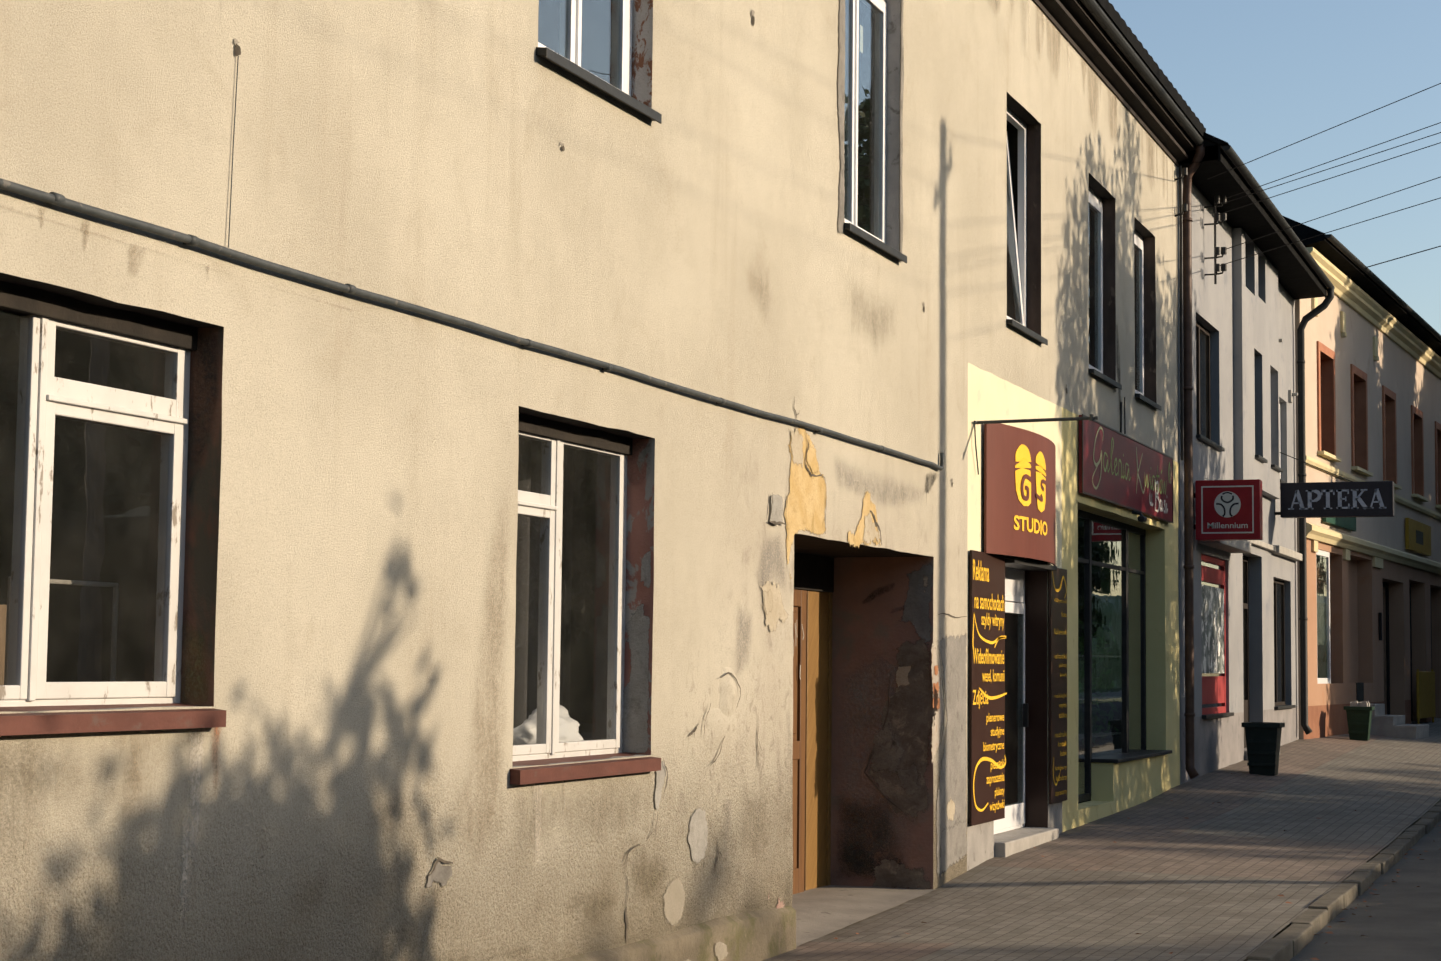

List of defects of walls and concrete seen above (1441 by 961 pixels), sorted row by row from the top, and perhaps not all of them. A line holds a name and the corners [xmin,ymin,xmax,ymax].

flaking render [770,427,827,578]
flaking render [848,491,882,547]
peeling [623,551,651,753]
flaking render [864,564,945,822]
flaking render [654,758,668,841]
flaking render [946,799,955,821]